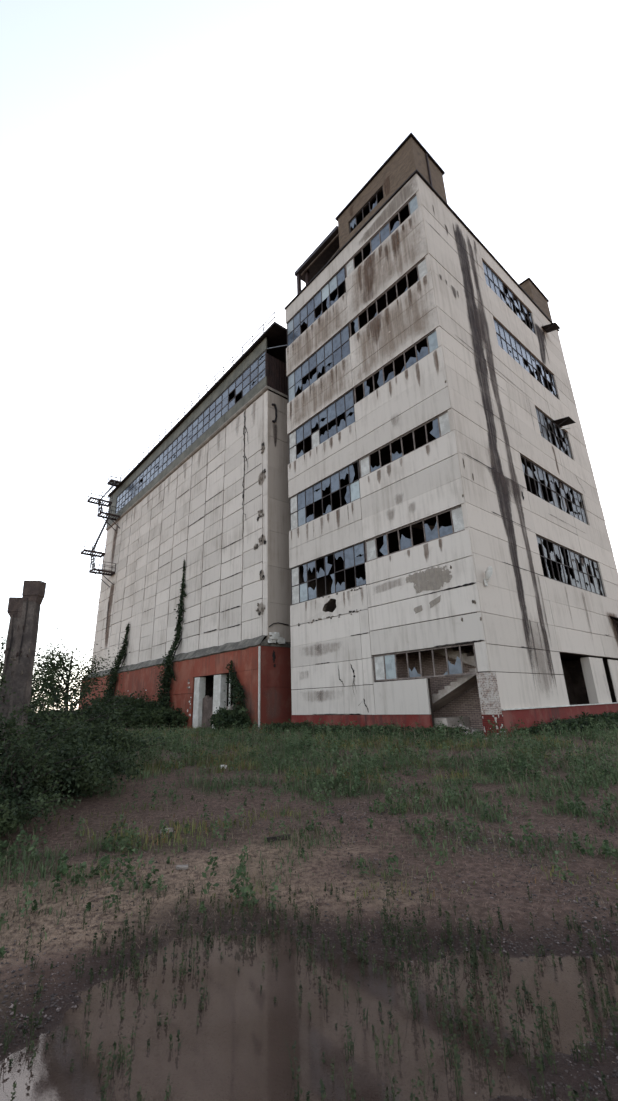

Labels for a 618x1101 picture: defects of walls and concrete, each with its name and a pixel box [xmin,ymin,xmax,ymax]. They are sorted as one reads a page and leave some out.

damp [374,219,411,281]
damp [357,275,427,369]
damp [439,225,556,681]
peeling [406,565,452,613]
crack [314,662,369,715]